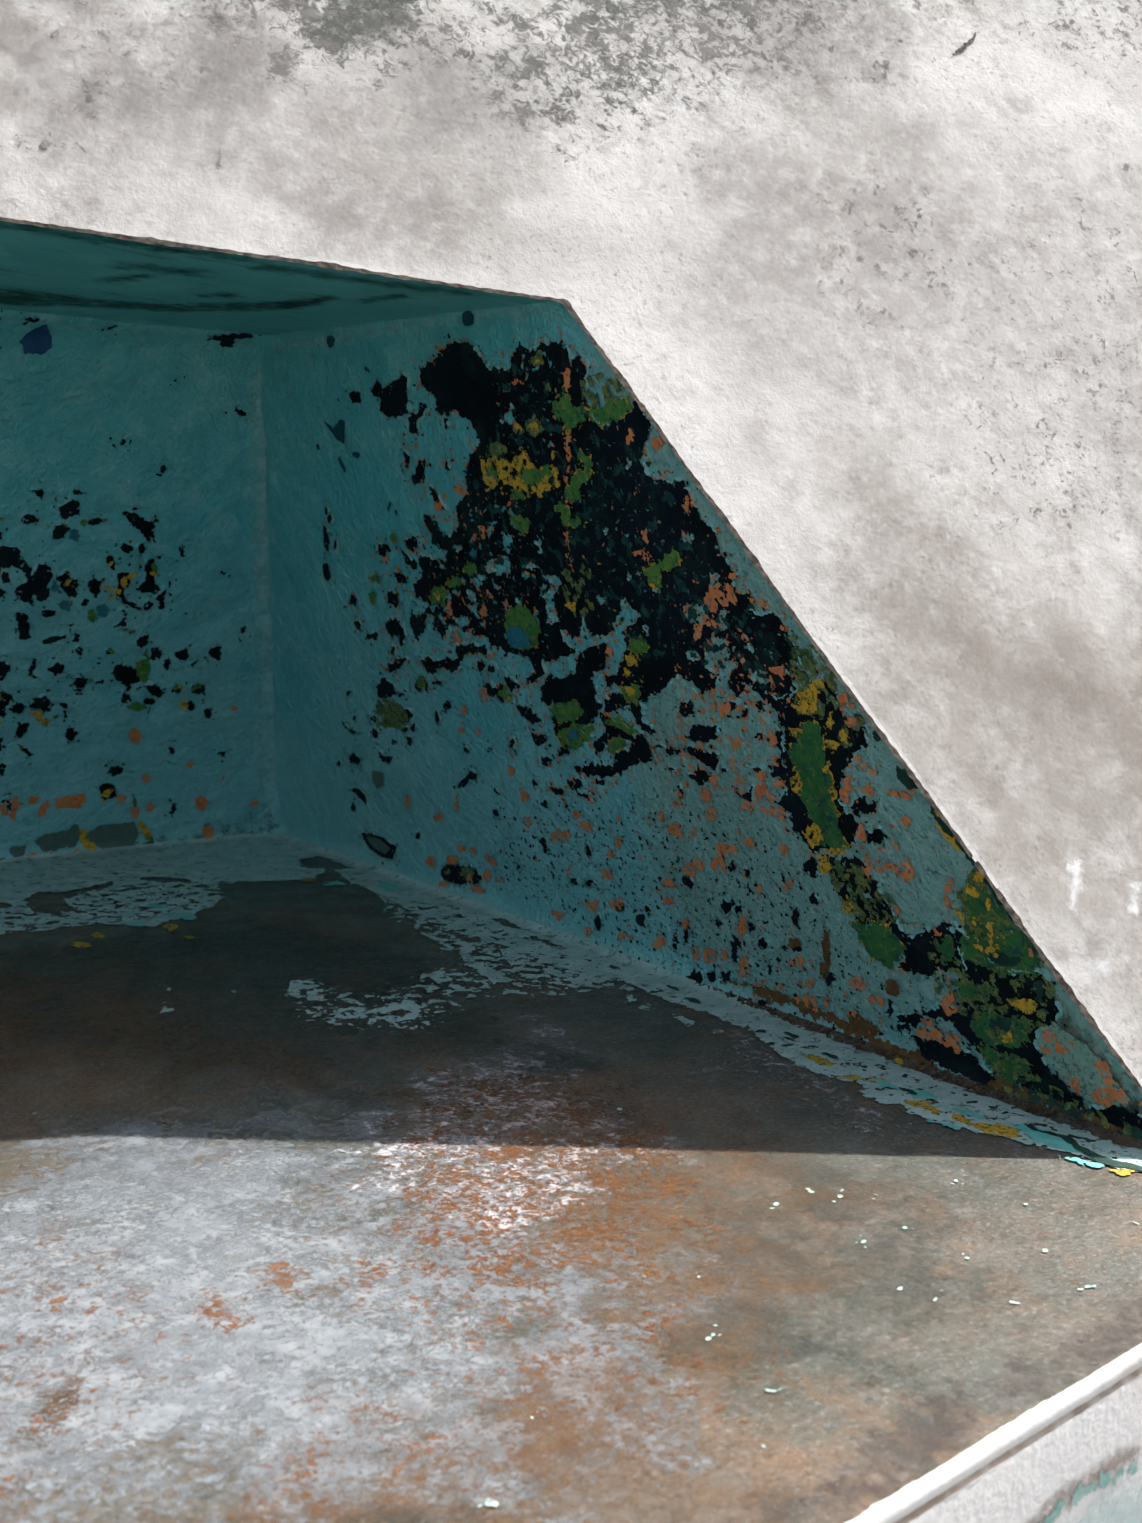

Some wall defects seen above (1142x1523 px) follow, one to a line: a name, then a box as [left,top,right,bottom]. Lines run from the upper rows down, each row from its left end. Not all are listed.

peeling [0,217,1142,1172]
rust [0,1055,823,1523]